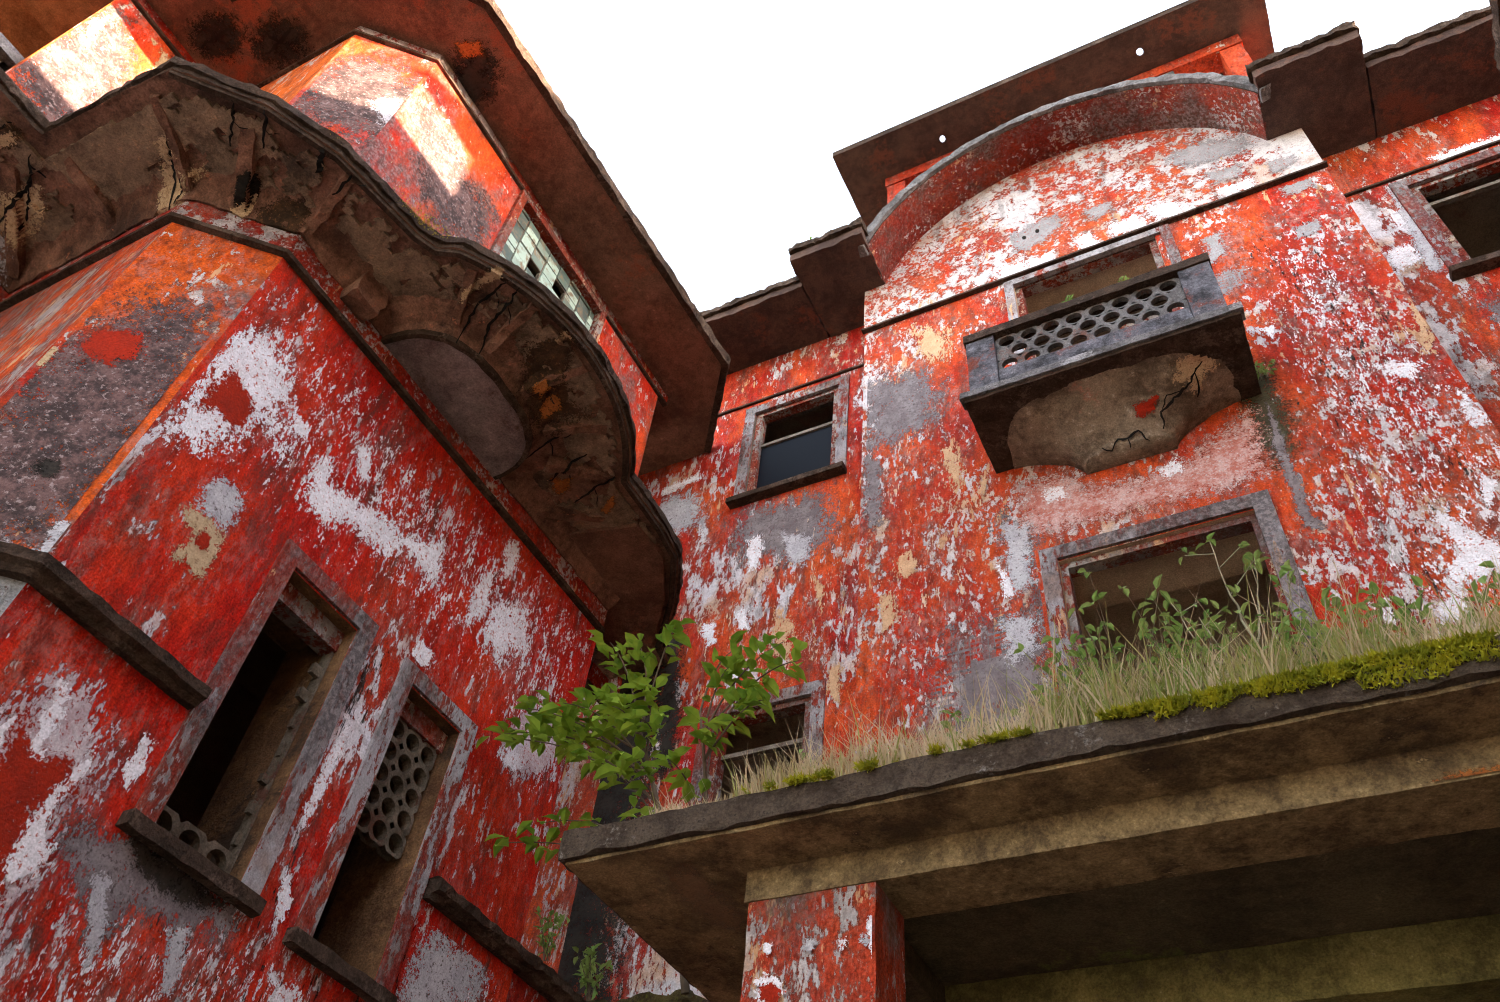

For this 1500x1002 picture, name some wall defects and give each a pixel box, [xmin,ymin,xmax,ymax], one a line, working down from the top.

damp [185,7,315,73]
peeling [1216,176,1256,197]
peeling [1428,133,1500,160]
crack [1102,361,1202,452]
peeling [163,296,595,793]
peeling [660,472,855,733]
peeling [294,715,352,837]
peeling [0,651,310,1002]
peeling [395,925,495,1002]